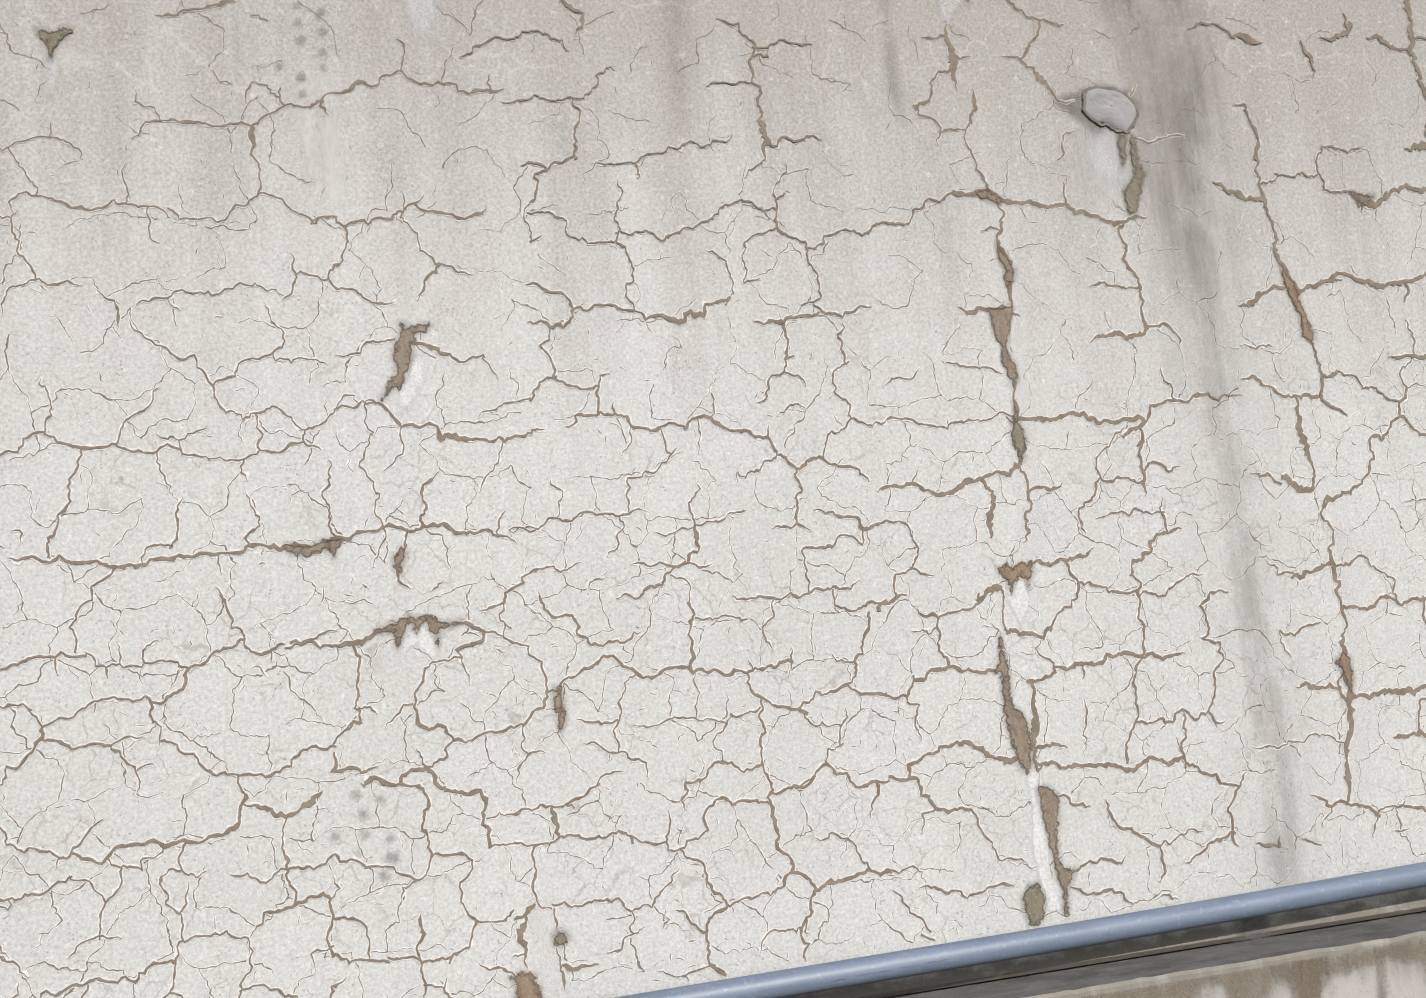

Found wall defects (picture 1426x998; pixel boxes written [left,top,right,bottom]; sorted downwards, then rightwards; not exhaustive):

crack [155,0,236,97]
crack [459,29,570,58]
crack [559,0,614,55]
crack [1187,17,1262,46]
crack [1260,12,1353,115]
spalling [1282,270,1314,344]
spalling [381,321,430,401]
crack [410,331,499,379]
spalling [987,306,1019,385]
spalling [1011,406,1028,459]
spalling [373,614,460,646]
spalling [994,637,1074,926]